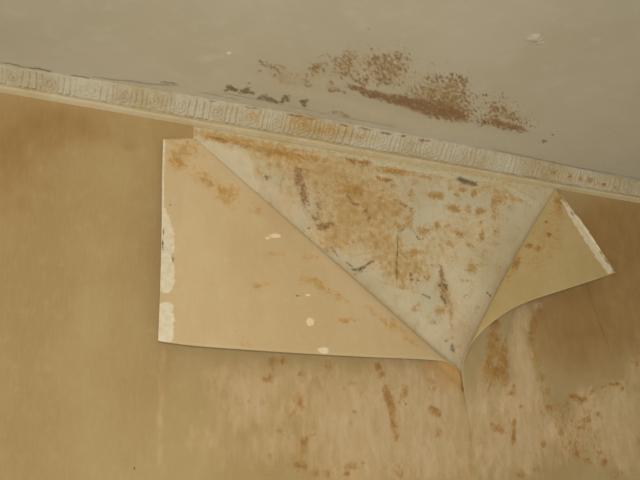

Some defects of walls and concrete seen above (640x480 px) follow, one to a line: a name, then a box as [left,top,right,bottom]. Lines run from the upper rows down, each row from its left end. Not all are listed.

mould [224,82,290,104]
mould [329,52,526,131]
leakage [201,131,430,288]